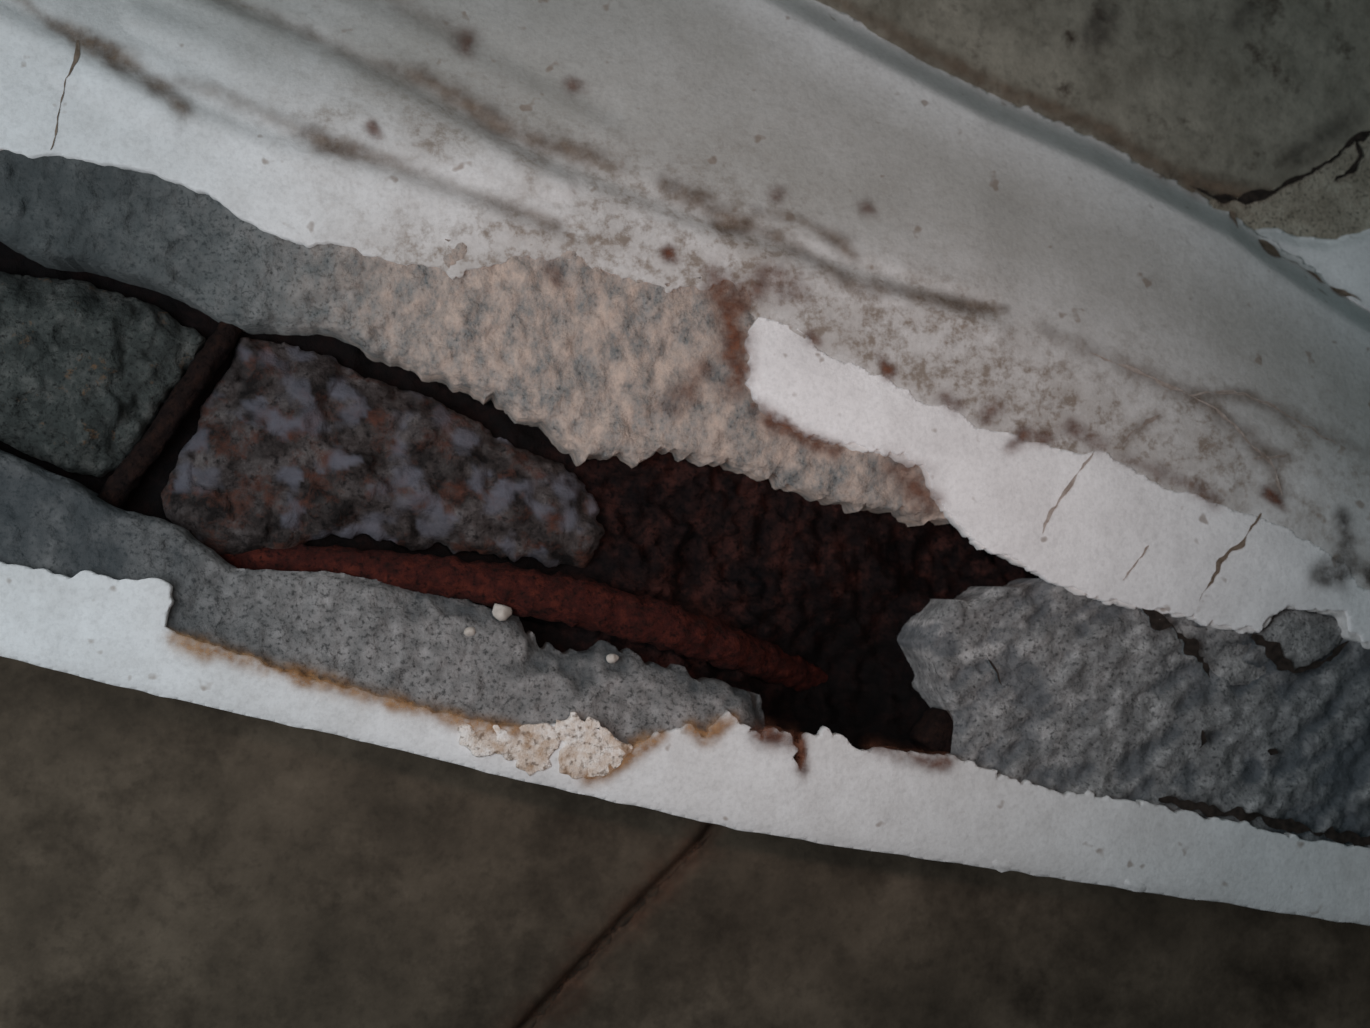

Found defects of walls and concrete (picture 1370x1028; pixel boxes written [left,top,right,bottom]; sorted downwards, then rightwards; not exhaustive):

spalling [0,150,1370,848]